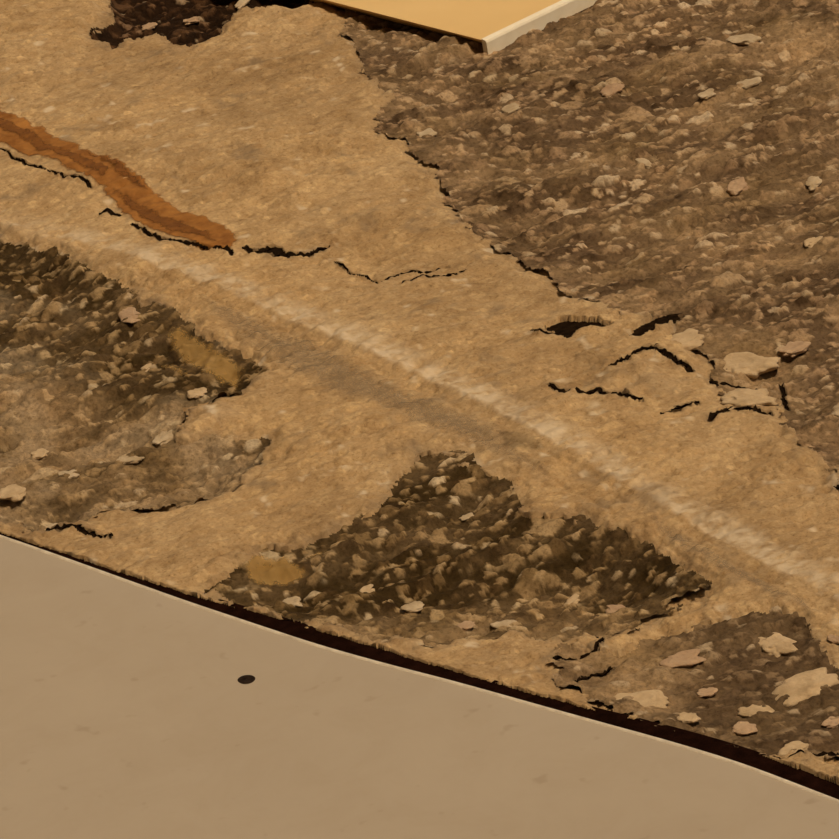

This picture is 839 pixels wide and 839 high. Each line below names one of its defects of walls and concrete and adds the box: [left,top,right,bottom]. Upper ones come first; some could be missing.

flaking render [89,0,314,49]
crack [0,148,91,188]
rust [0,111,236,251]
crack [99,208,466,284]
flaking render [339,0,839,480]
flaking render [0,238,272,532]
crack [548,382,643,400]
crack [608,343,789,420]
flaking render [204,450,839,760]